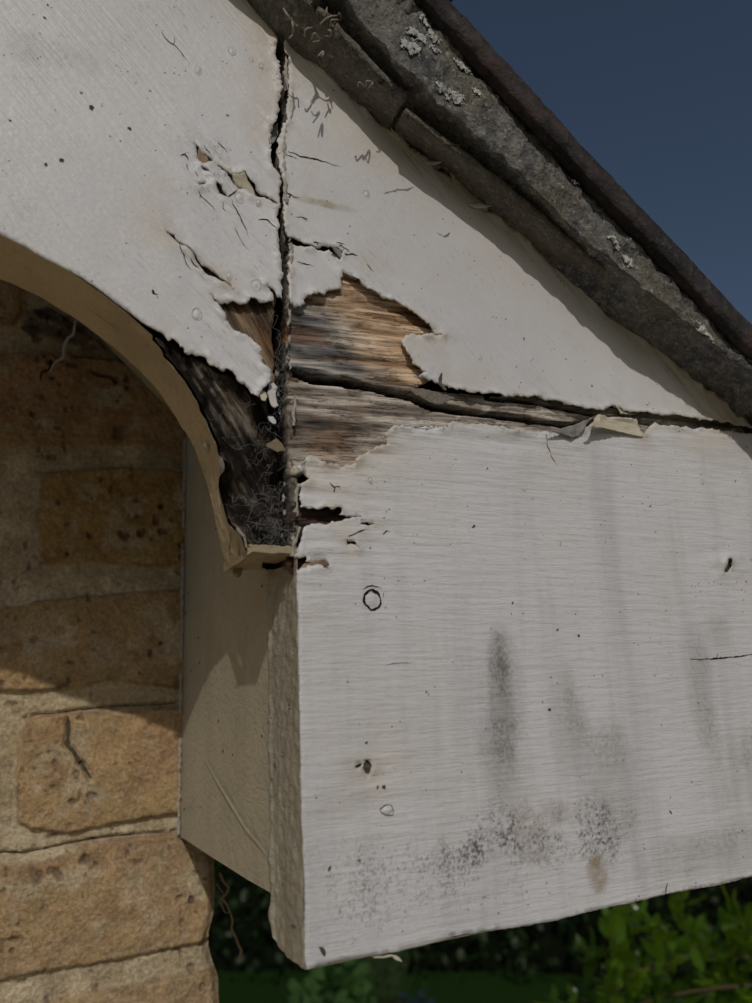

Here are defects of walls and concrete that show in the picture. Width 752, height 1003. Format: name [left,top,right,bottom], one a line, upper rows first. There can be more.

crack [168,233,225,282]
crack [181,53,374,570]
peeling [213,273,745,481]
peeling [288,505,371,532]
peeling [286,556,329,575]
crack [25,703,176,778]